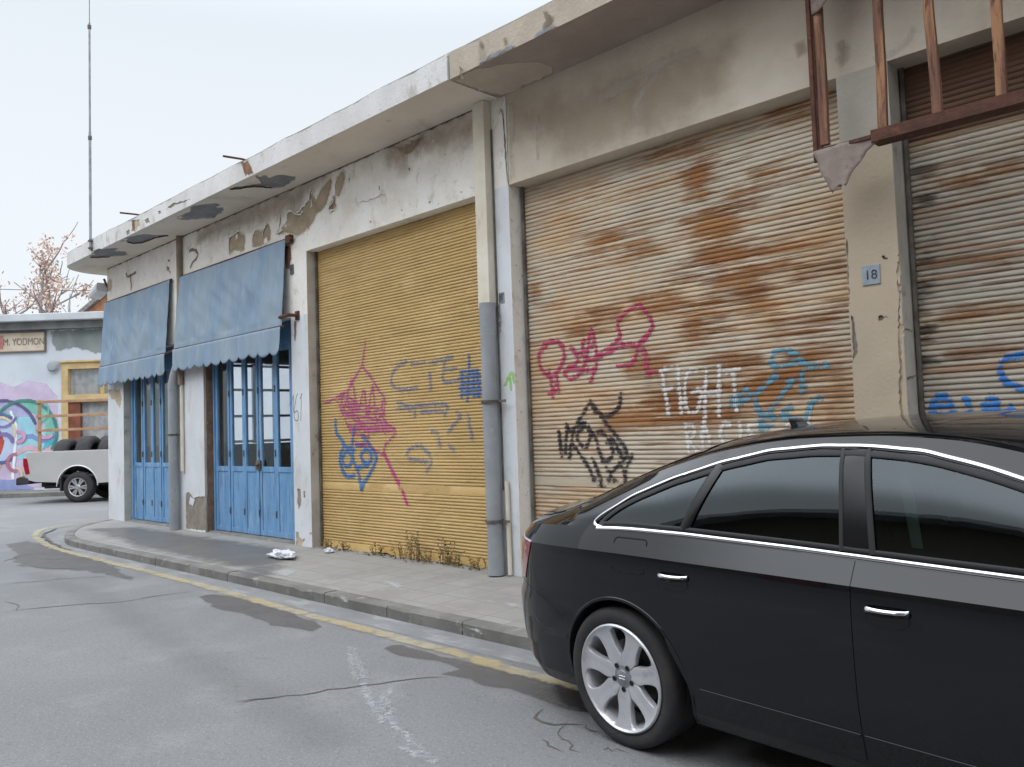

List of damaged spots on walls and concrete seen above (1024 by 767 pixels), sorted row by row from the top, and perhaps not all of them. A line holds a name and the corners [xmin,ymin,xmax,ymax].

corrosion [904,31,1024,120]
corrosion [908,109,1024,142]
corrosion [939,163,1024,187]
flaking render [228,173,350,253]
corrosion [568,142,847,340]
corrosion [937,300,1024,321]
corrosion [946,346,1019,360]
corrosion [598,345,854,430]
flaking render [186,492,207,531]